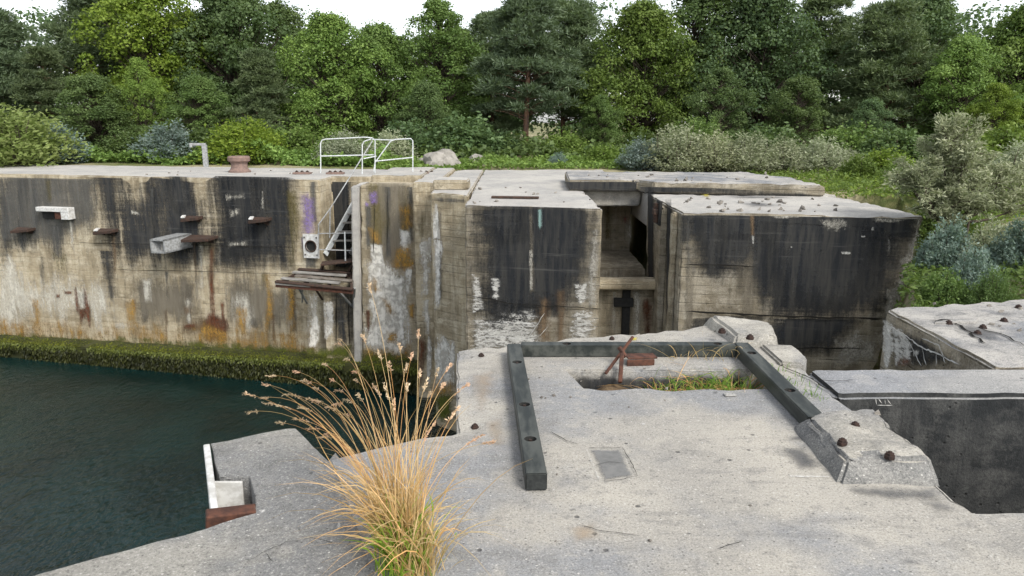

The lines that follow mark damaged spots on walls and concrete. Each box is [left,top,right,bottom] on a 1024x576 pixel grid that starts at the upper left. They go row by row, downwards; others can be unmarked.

rust [50,288,90,335]
damp [0,176,297,340]
rust [184,246,312,342]
peeling [363,244,412,356]
peeling [400,230,410,251]
damp [470,206,611,345]
damp [565,182,918,365]